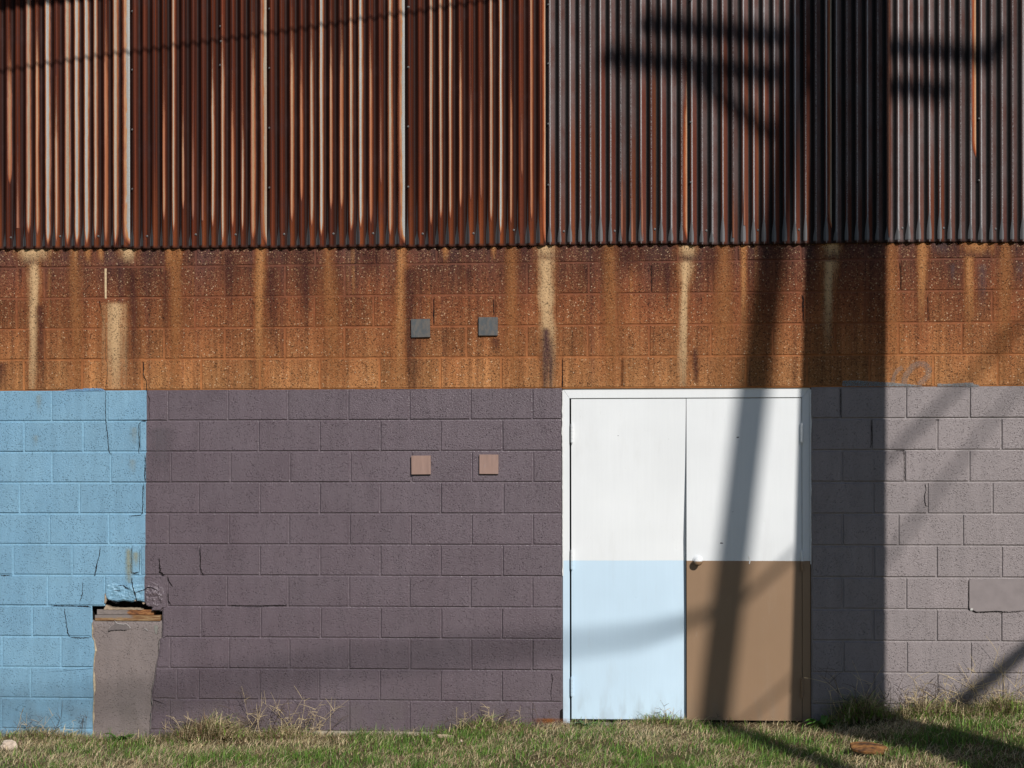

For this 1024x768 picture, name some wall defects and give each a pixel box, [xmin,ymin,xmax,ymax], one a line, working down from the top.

rust [7,0,130,245]
rust [162,0,267,244]
rust [290,0,405,243]
rust [429,0,546,243]
water stain [18,249,51,377]
water stain [103,303,127,382]
water stain [538,245,556,387]
rust [543,329,552,383]
water stain [679,245,694,373]
crack [64,548,158,639]
spalling [104,583,145,632]